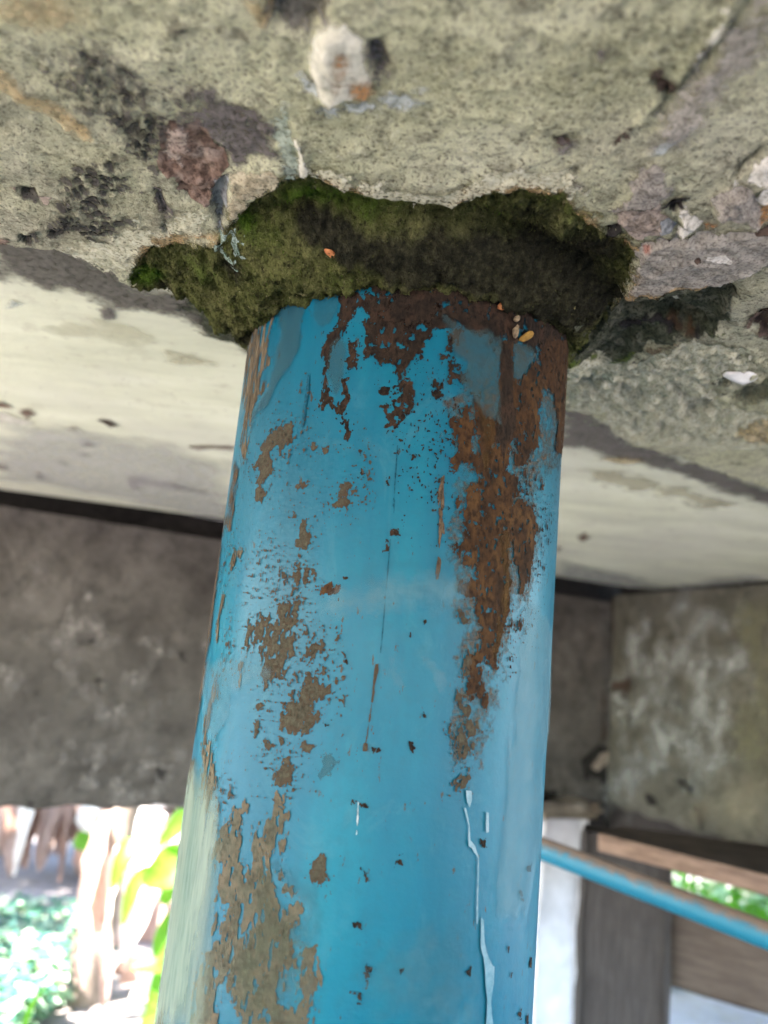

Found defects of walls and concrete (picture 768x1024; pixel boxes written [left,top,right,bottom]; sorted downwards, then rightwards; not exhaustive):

peeling [0,118,279,328]
leakage [38,37,298,272]
spalling [262,0,370,108]
peeling [604,157,768,298]
peeling [188,291,472,1024]
rust [353,285,569,797]